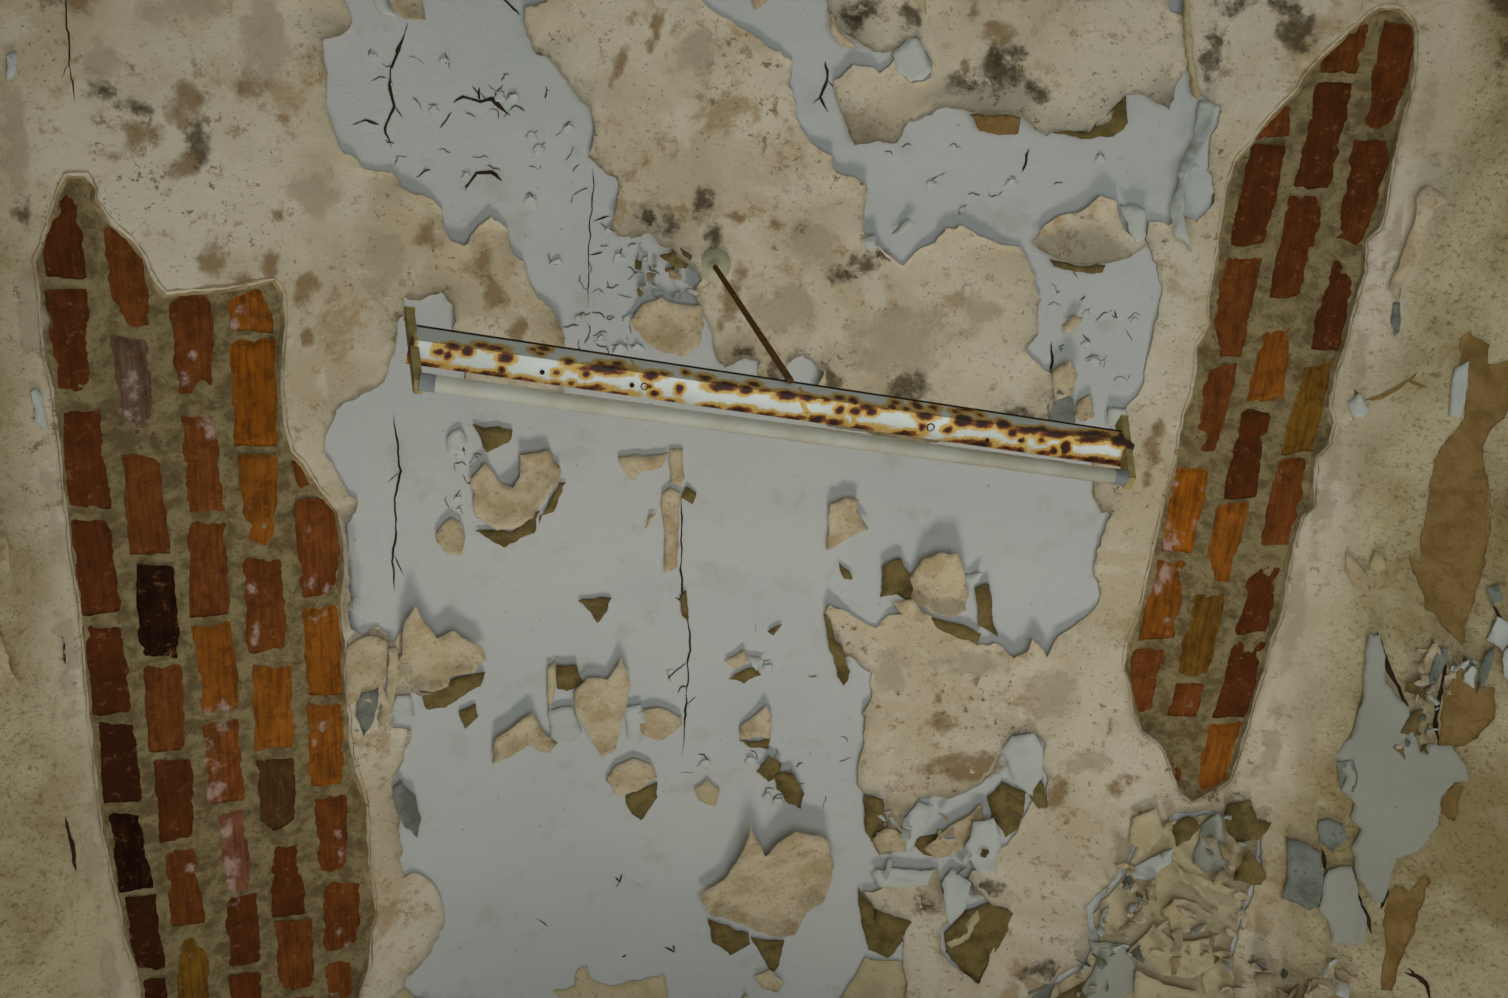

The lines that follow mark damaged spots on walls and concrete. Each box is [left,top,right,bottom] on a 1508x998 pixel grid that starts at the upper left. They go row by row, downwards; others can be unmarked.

water stain [648,15,663,52]
water stain [842,0,877,30]
water stain [900,5,921,26]
water stain [951,5,1049,104]
crack [352,23,659,355]
peeling [0,0,566,998]
crack [391,421,403,592]
peeling [524,0,1508,998]
crack [666,492,826,810]
peeling [492,657,683,820]